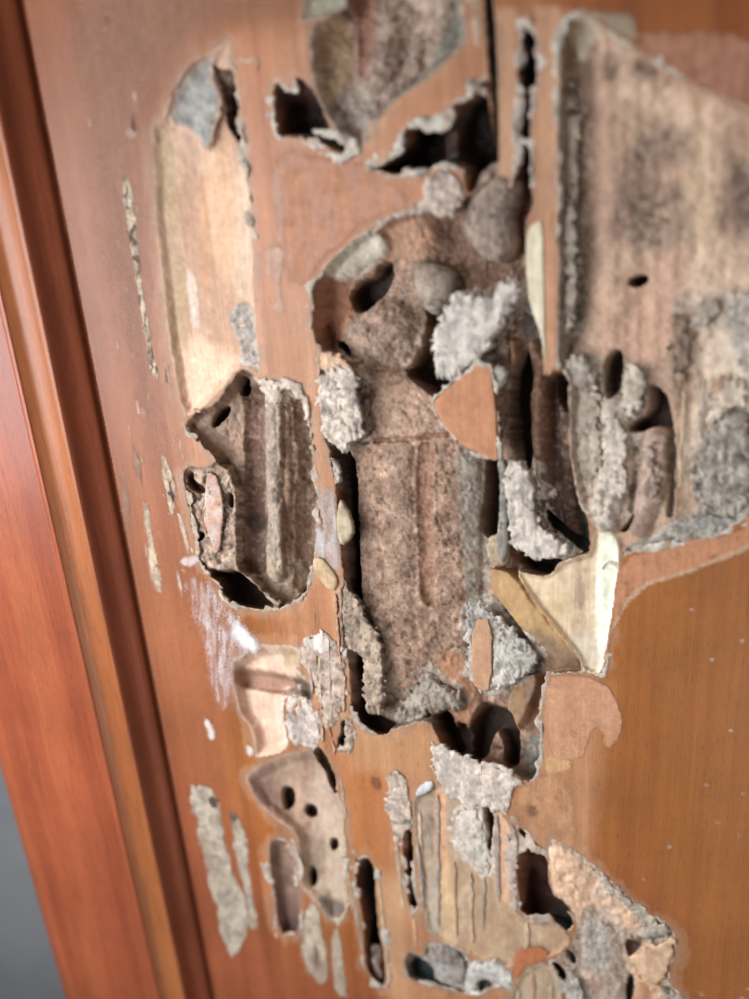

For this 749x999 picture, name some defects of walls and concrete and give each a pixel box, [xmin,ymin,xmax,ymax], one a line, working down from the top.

spalling [163,0,749,938]
spalling [503,815,682,999]
spalling [381,928,392,949]
spalling [360,954,391,990]
spalling [404,941,518,996]